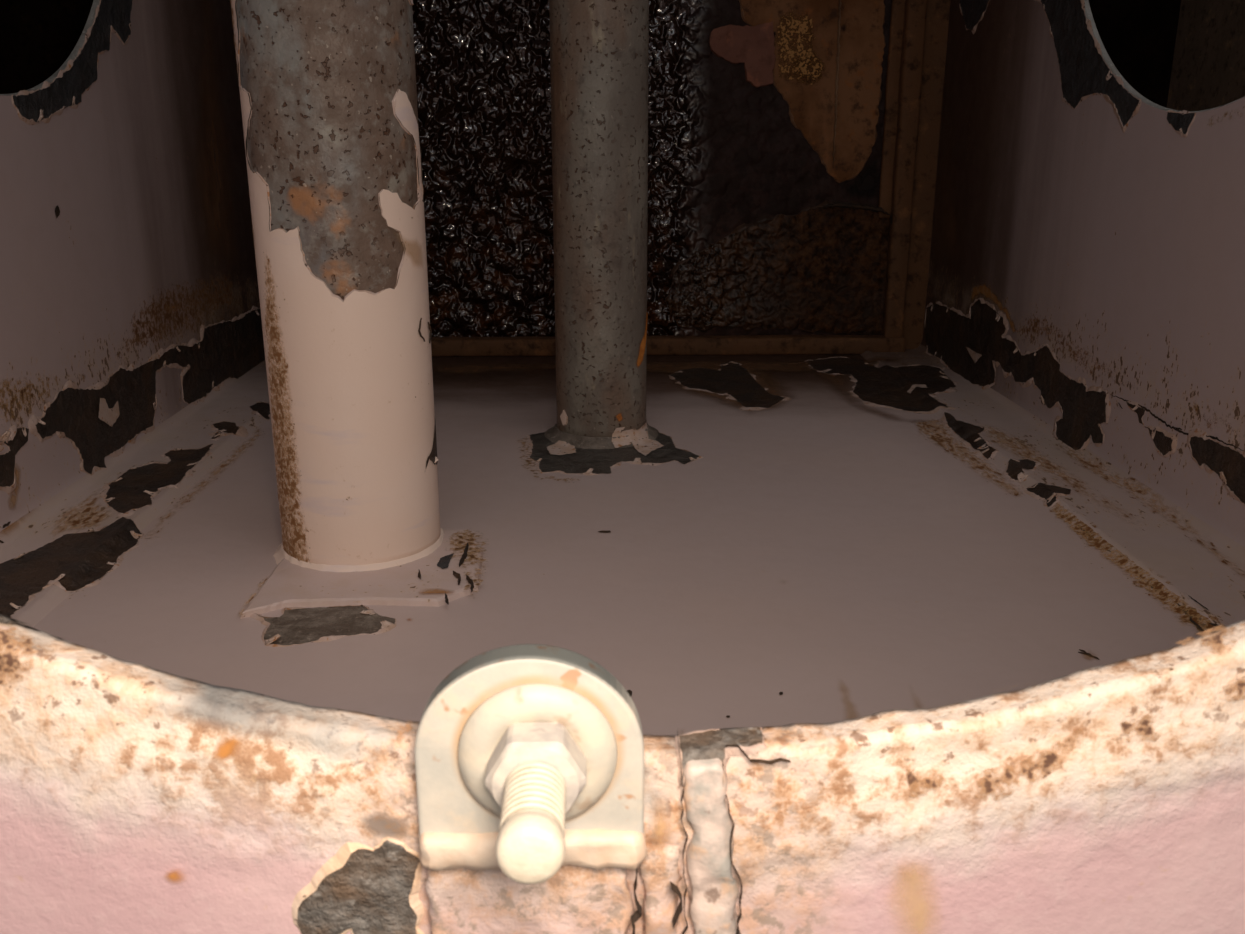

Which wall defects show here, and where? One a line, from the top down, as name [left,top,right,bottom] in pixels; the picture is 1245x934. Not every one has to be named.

peeling [1034,0,1141,133]
peeling [0,305,271,640]
rust [158,252,309,562]
peeling [804,298,1111,508]
rust [0,627,48,685]
peeling [250,605,397,647]
rust [975,729,1081,800]
rust [1121,714,1159,743]
peeling [292,836,424,934]
crack [631,869,642,934]
crack [670,729,688,934]
crack [722,745,791,934]